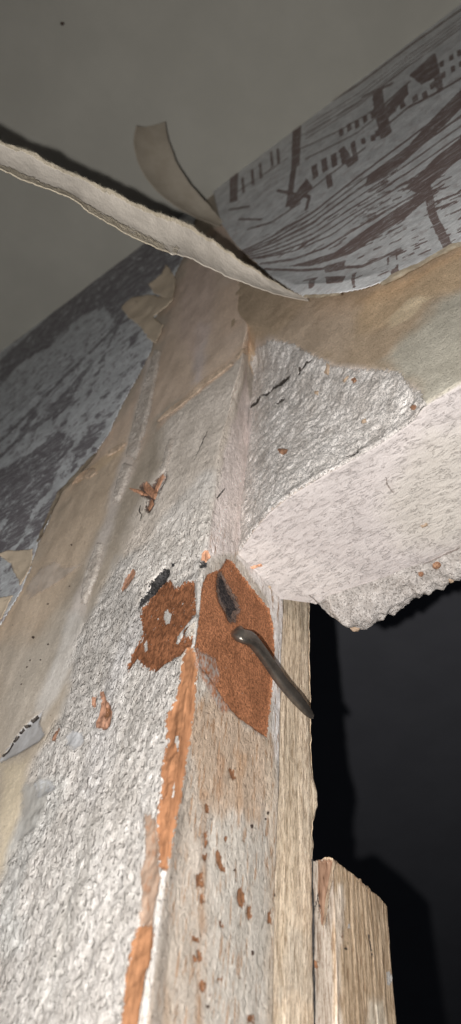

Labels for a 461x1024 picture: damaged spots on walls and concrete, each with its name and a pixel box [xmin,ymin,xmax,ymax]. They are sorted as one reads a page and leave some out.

crack [250,360,312,408]
spalling [122,569,135,591]
corrosion [195,831,227,904]
corrosion [236,887,252,921]
corrosion [192,935,202,963]